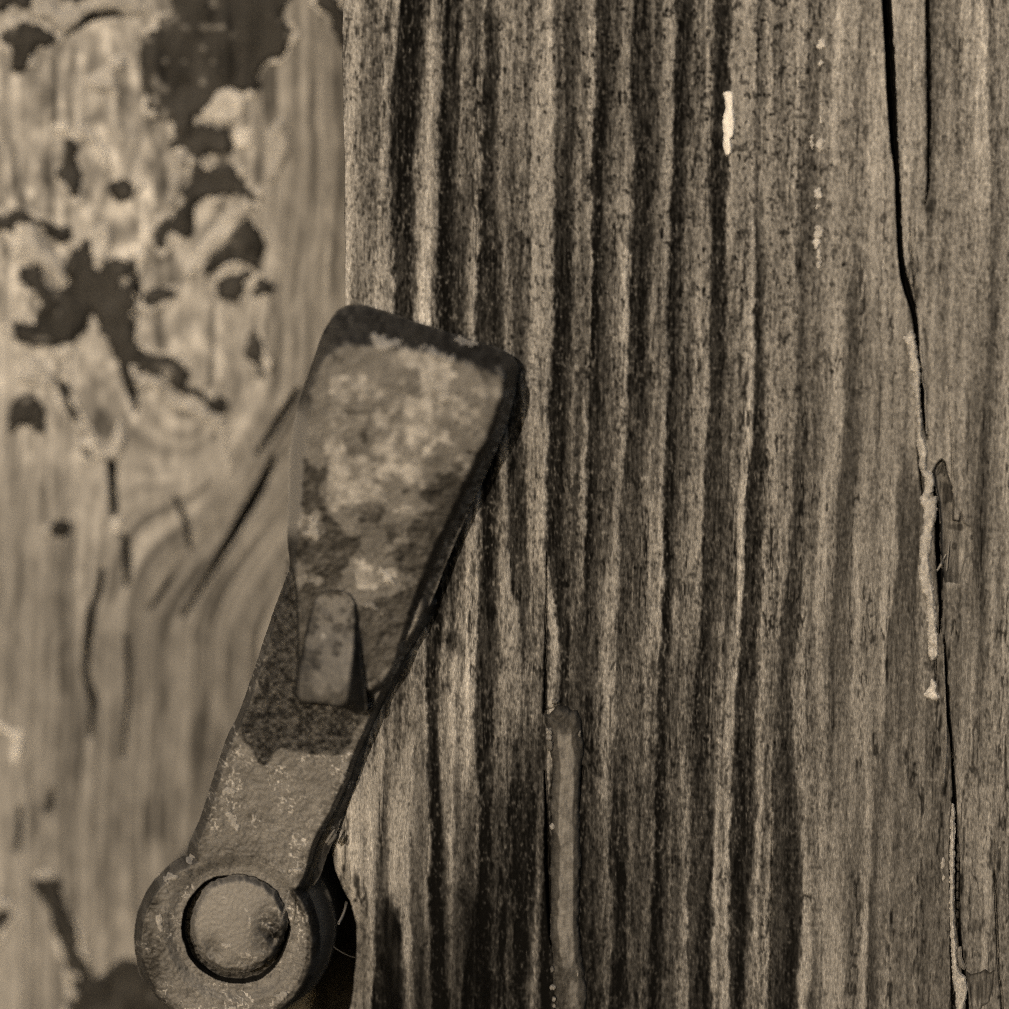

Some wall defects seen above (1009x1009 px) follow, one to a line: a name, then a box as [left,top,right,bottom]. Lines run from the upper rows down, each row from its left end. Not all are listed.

peeling [309,0,343,50]
peeling [0,0,301,465]
peeling [41,518,74,540]
peeling [303,516,321,541]
crack [881,0,969,1009]
rust [241,561,374,765]
peeling [0,723,24,763]
peeling [0,909,18,944]
peeling [32,878,168,1009]
peeling [158,872,179,885]
peeling [307,898,357,1009]
crack [994,846,1003,1009]